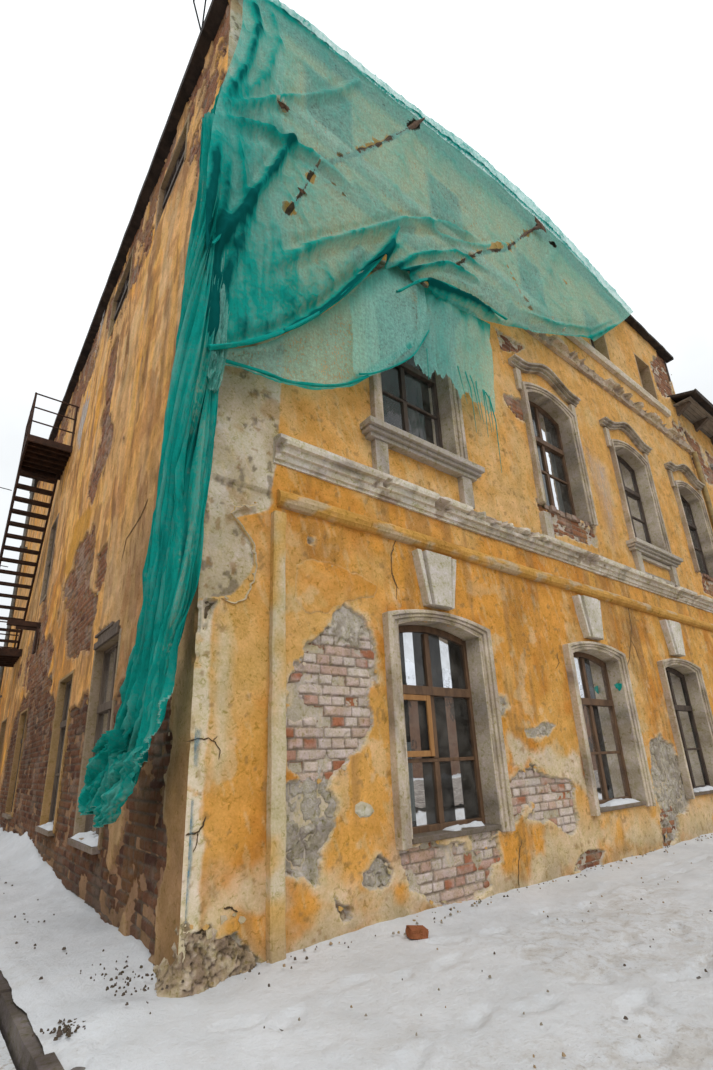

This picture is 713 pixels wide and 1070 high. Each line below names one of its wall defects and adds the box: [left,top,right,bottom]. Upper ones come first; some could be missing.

flaking render [188,5,230,184]
flaking render [55,134,177,504]
flaking render [651,354,672,397]
flaking render [64,525,108,659]
peeling [203,502,259,629]
flaking render [537,503,595,544]
flaking render [0,599,257,998]
flaking render [285,605,377,886]
peeling [525,723,554,737]
flaking render [510,765,576,833]
flaking render [649,734,690,846]
flaking render [362,830,500,905]